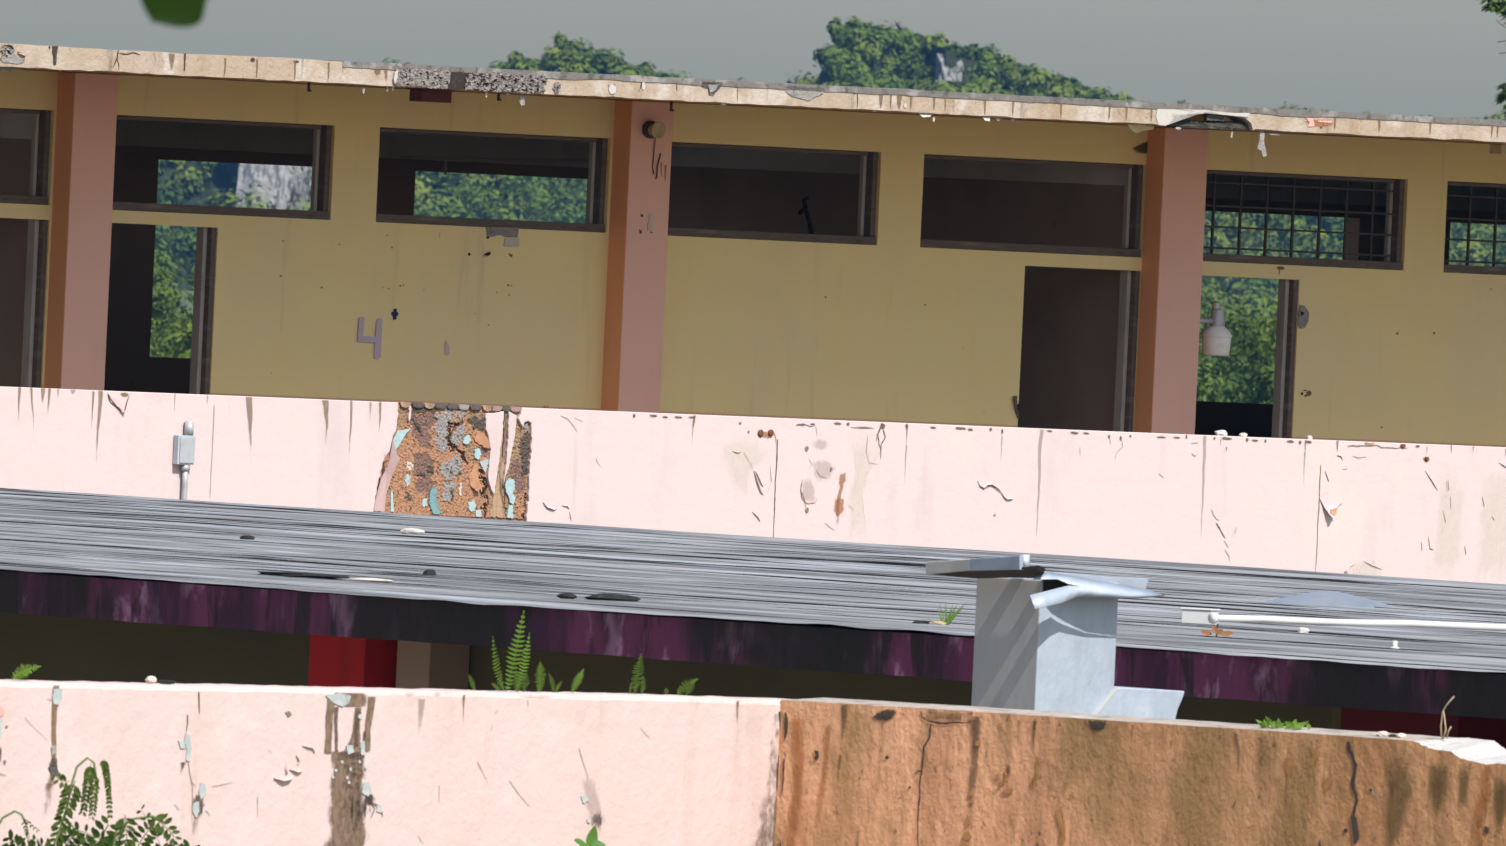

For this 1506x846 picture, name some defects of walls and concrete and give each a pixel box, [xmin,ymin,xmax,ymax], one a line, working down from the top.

spalling [386,68,561,105]
damp [18,387,51,416]
damp [92,390,103,442]
spalling [373,401,571,519]
peeling [326,693,363,719]
damp [1089,721,1106,730]
peeling [331,741,383,813]
damp [959,716,980,846]
damp [1431,772,1466,804]